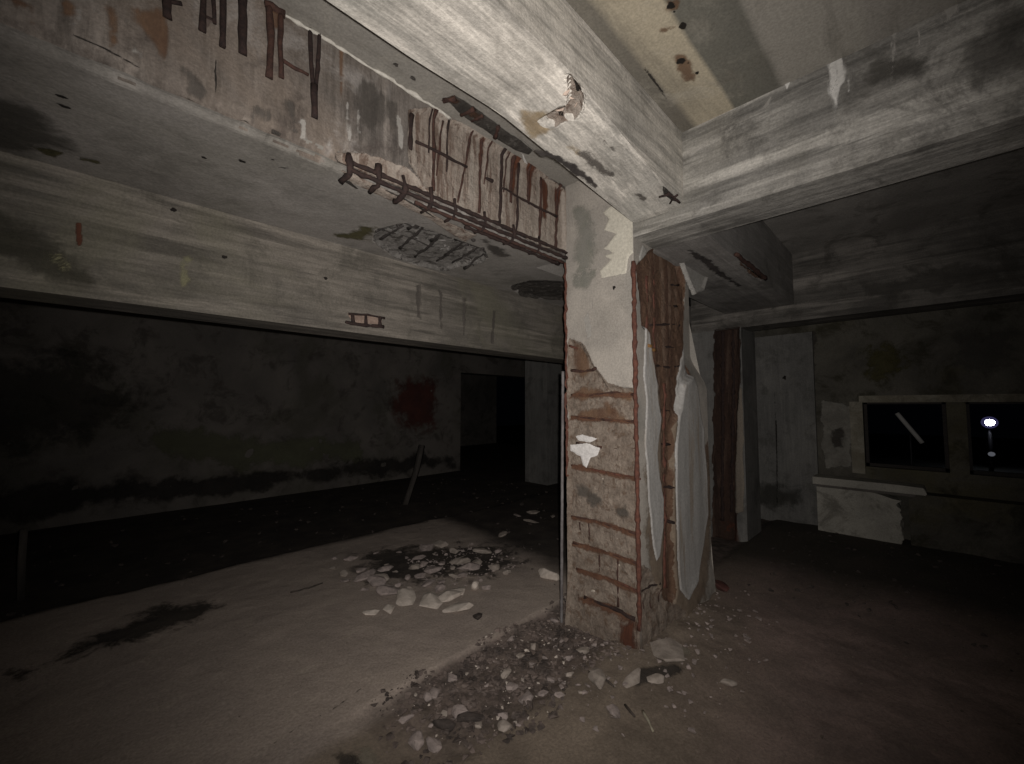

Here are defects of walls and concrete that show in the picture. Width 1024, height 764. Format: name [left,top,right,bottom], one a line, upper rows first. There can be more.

rust [676,55,695,81]
spalling [545,74,584,127]
spalling [335,95,745,649]